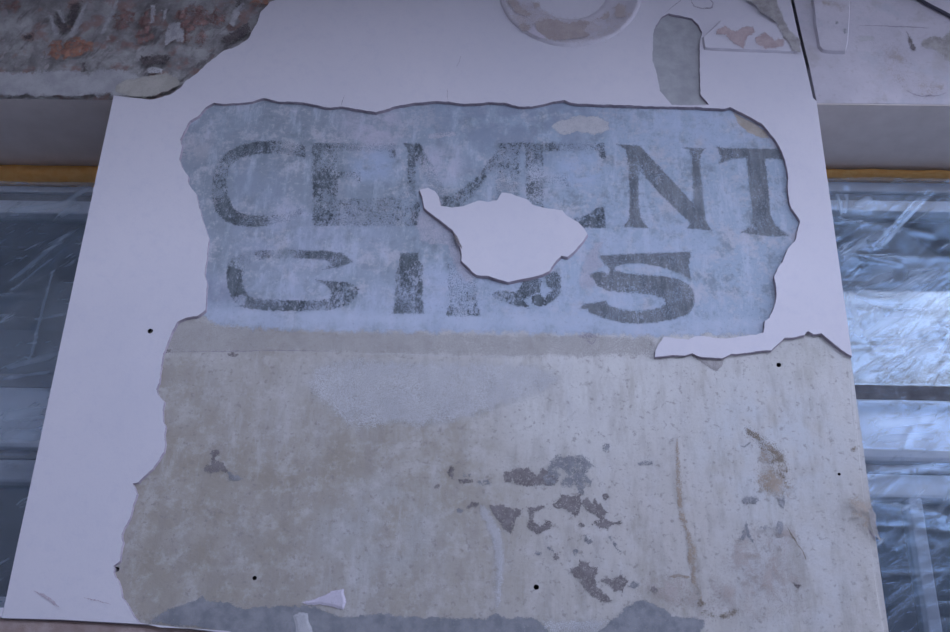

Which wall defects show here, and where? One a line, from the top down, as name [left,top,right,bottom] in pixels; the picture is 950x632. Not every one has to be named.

flaking render [0,0,274,100]
flaking render [179,13,800,242]
flaking render [503,0,632,44]
flaking render [3,190,889,632]